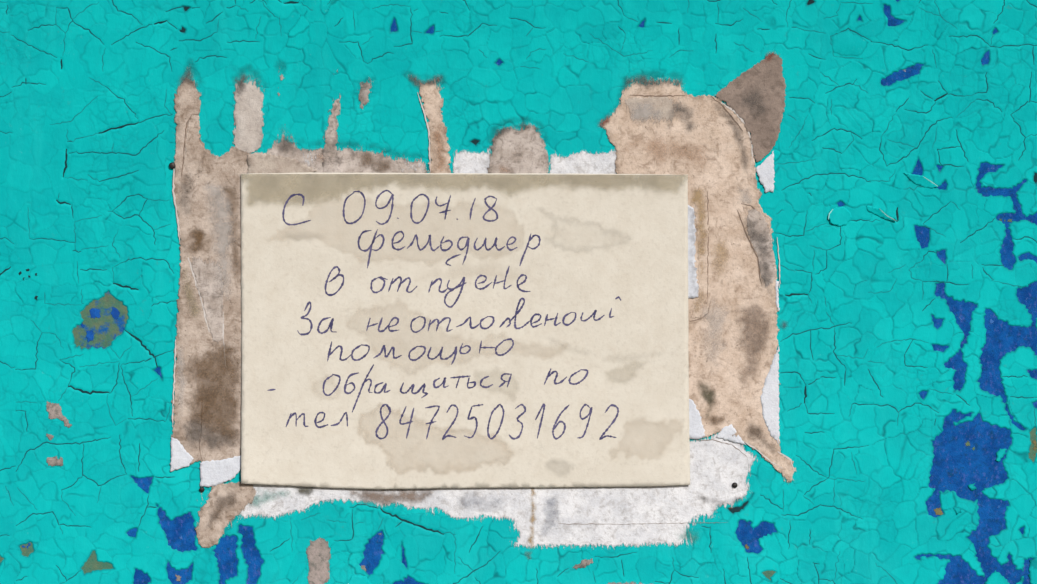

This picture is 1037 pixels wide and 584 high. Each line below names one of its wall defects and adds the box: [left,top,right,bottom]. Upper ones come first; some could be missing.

peeling [881,64,923,86]
peeling [976,163,1037,270]
peeling [72,291,128,349]
crack [0,0,587,536]
crack [589,0,1037,584]
peeling [915,281,1037,584]
peeling [157,505,197,584]
peeling [213,525,264,584]
peeling [348,531,384,584]
crack [271,504,500,584]
crack [536,552,637,584]
peeling [728,501,777,554]